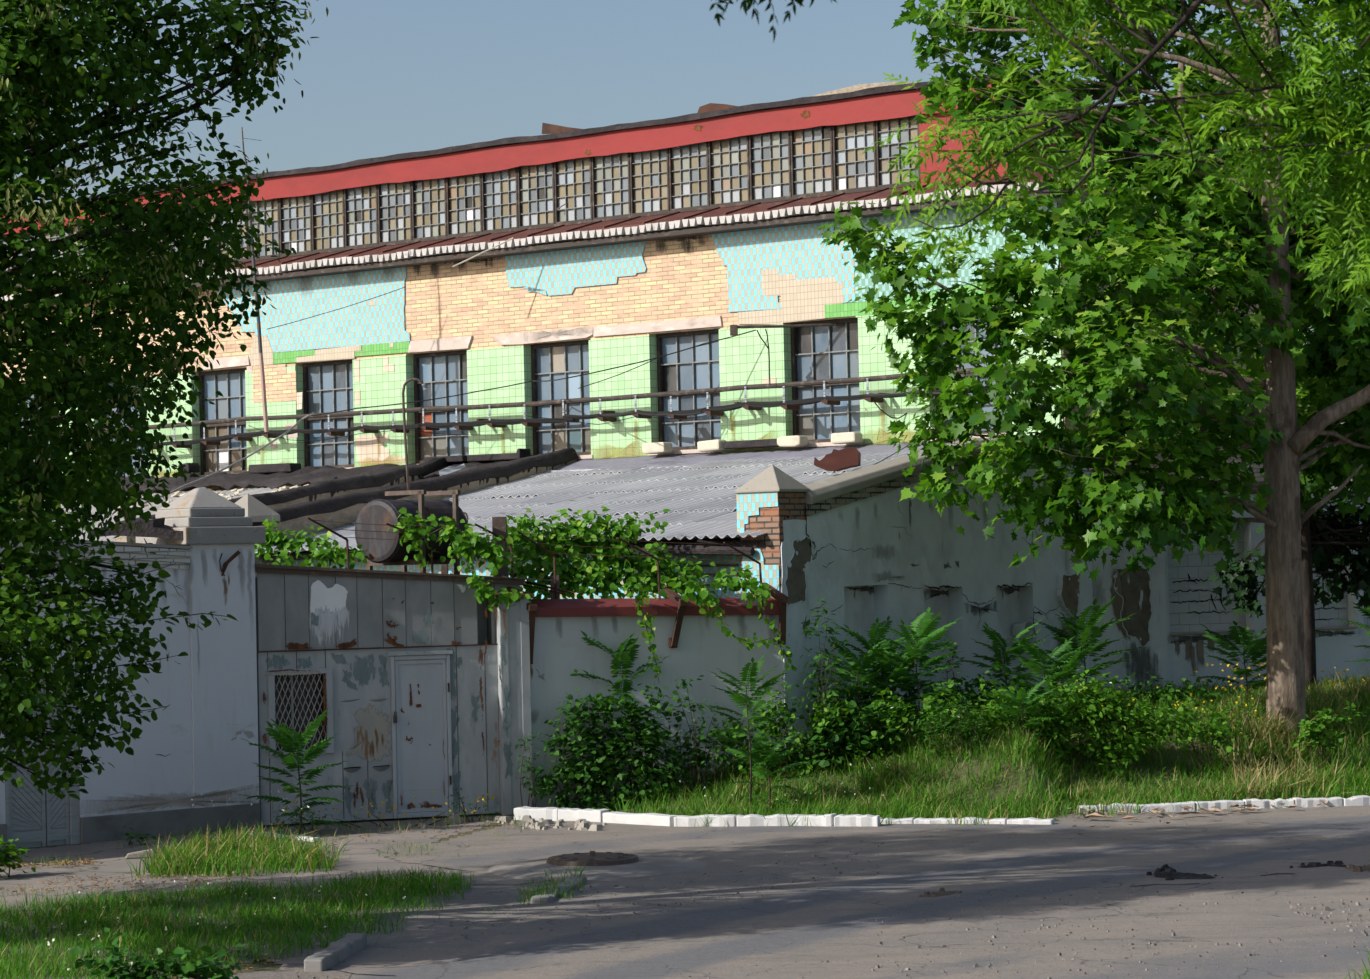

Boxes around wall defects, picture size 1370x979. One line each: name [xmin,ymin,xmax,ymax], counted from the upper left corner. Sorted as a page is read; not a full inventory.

spalling [738,269,843,325]
corrosion [814,447,861,471]
crack [805,499,912,570]
spalling [784,535,815,640]
crack [888,531,1060,633]
spalling [1057,573,1081,653]
spalling [1113,566,1153,647]
leakage [1110,570,1158,690]
leakage [1171,634,1241,672]
corrosion [401,684,421,744]
corrosion [400,781,445,809]